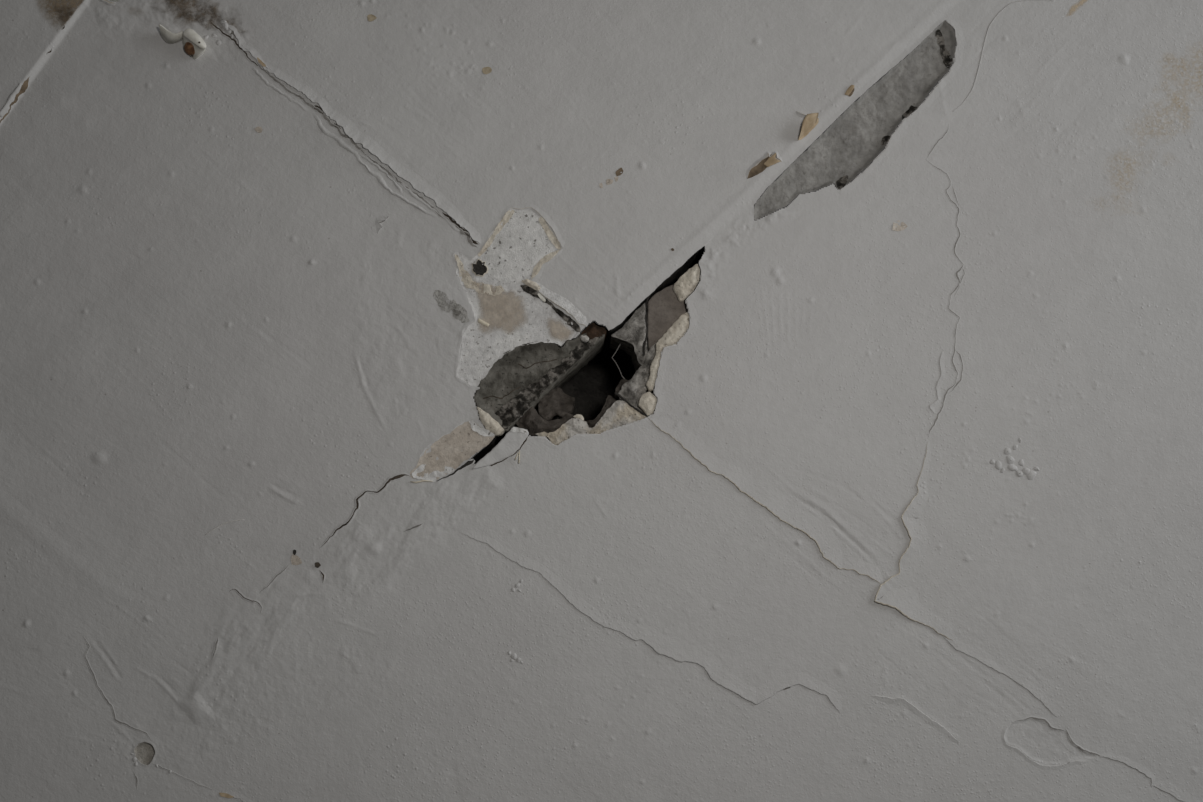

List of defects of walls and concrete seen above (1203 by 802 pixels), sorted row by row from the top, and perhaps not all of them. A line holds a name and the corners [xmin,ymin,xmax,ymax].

crack [0,25,66,125]
water stain [40,0,83,23]
crack [204,19,482,248]
spalling [745,18,964,220]
spalling [410,204,714,483]
crack [926,124,965,438]
crack [229,459,475,613]
peeling [874,442,1059,717]
crack [83,637,212,790]